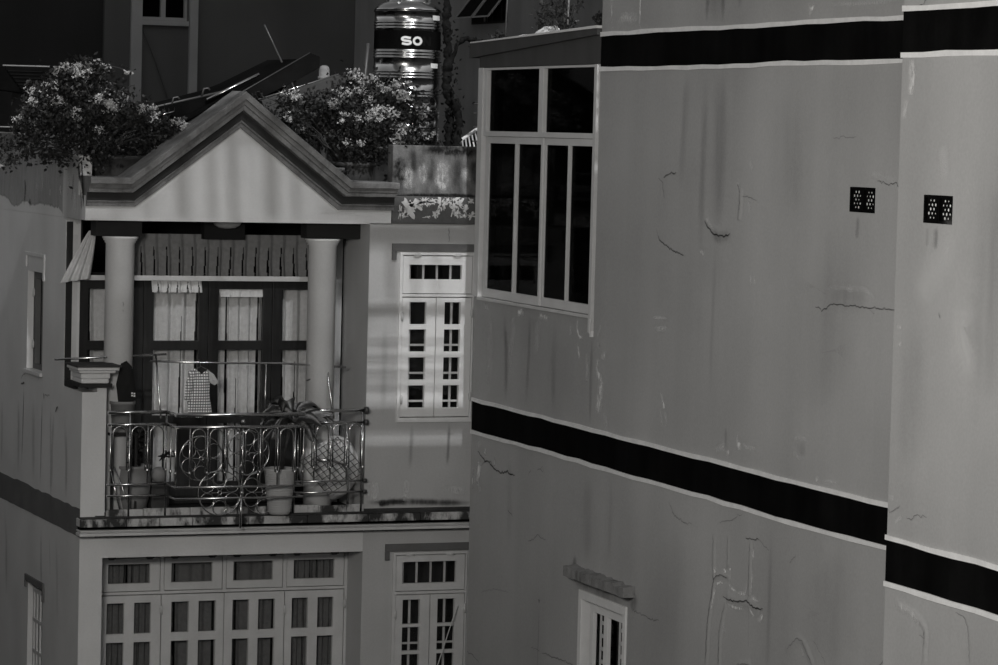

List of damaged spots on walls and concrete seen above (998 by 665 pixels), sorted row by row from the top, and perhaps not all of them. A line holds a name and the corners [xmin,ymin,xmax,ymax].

damp [394,155,414,182]
damp [429,146,475,182]
crack [821,303,892,312]